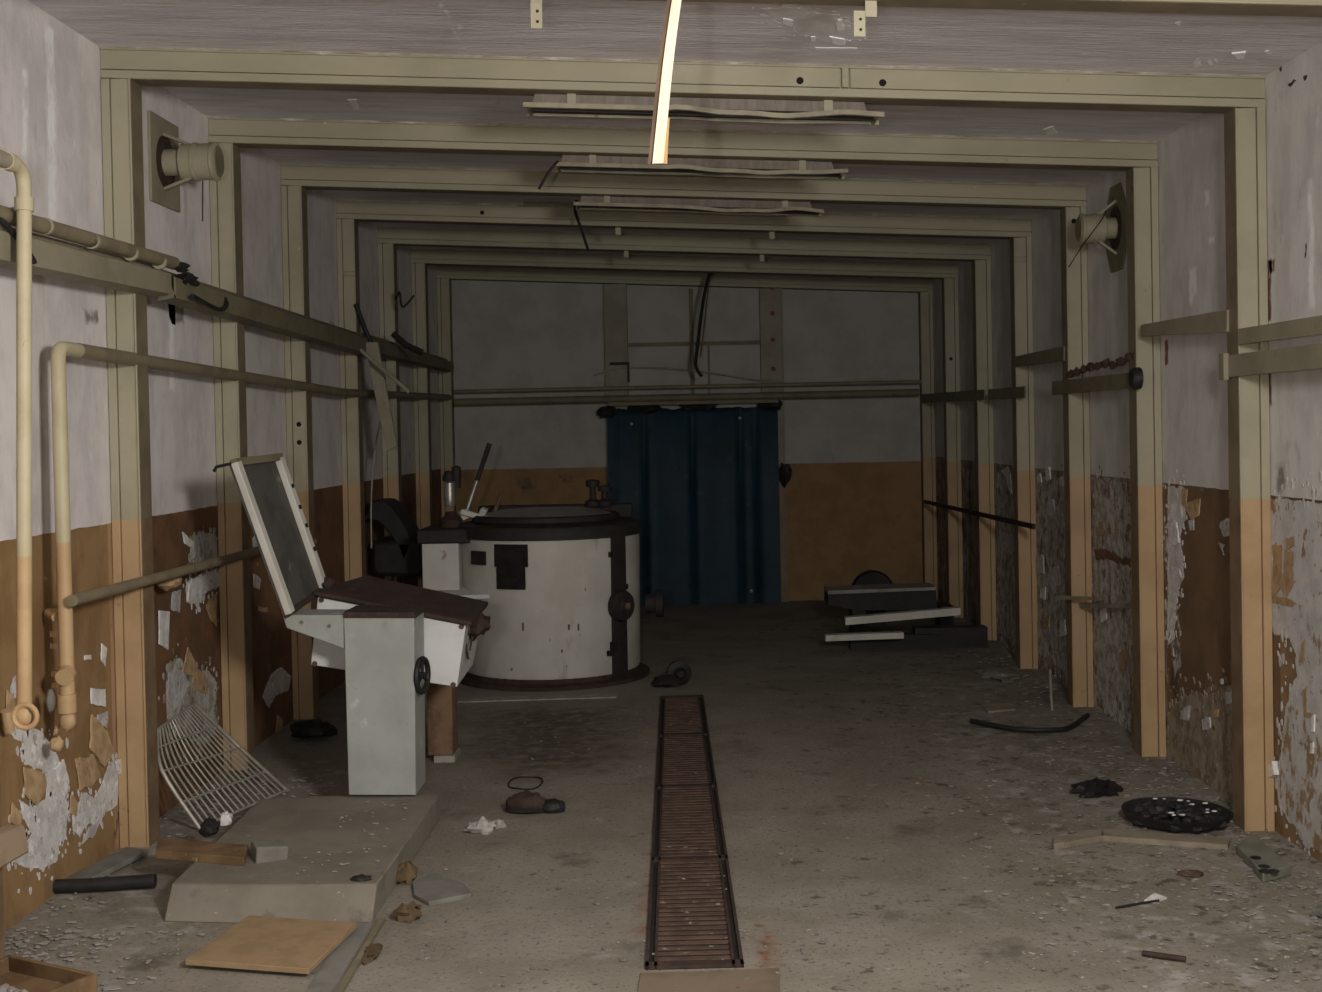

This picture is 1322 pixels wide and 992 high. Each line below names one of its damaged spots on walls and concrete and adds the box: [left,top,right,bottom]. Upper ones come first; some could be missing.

peeling [6,675,16,710]
peeling [5,688,121,895]
peeling [84,643,107,666]
peeling [158,526,222,758]
peeling [1091,465,1133,732]
peeling [1163,469,1201,657]
spalling [1153,662,1233,816]
peeling [1218,518,1230,555]
peeling [1269,465,1322,855]